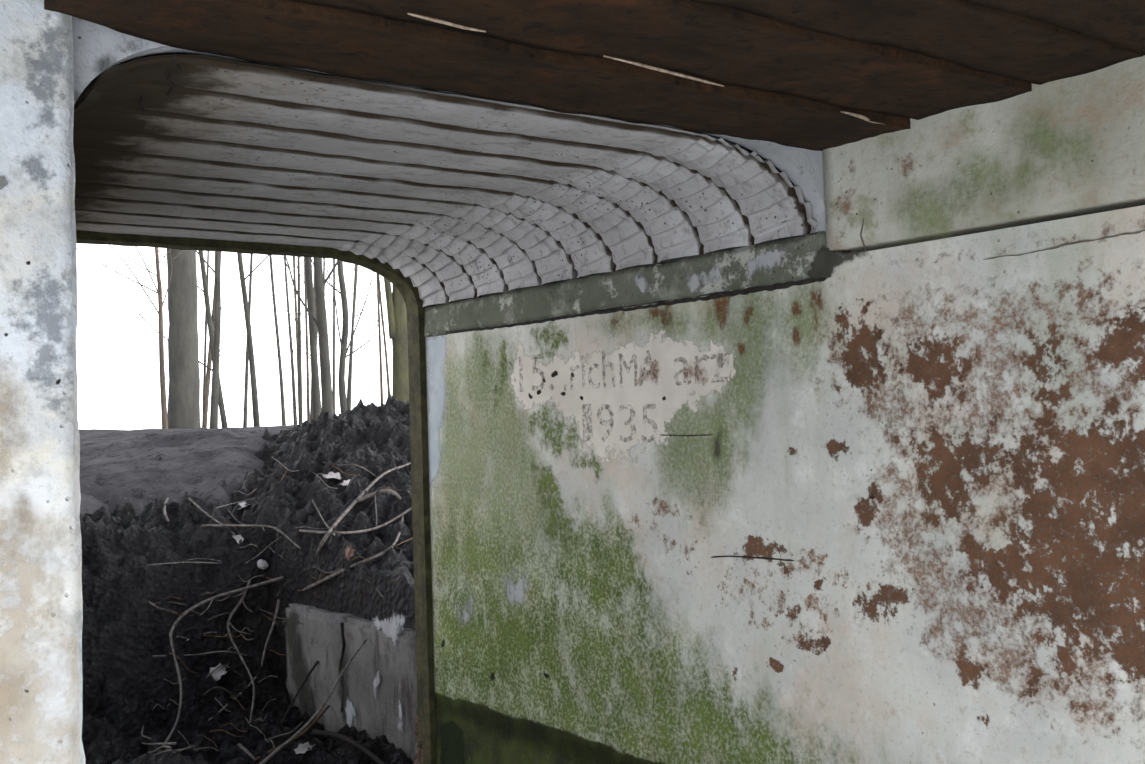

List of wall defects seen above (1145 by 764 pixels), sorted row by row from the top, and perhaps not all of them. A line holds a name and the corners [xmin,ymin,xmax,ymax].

crack [983,230,1145,260]
damp [426,335,446,484]
damp [504,571,527,605]
damp [435,693,662,764]